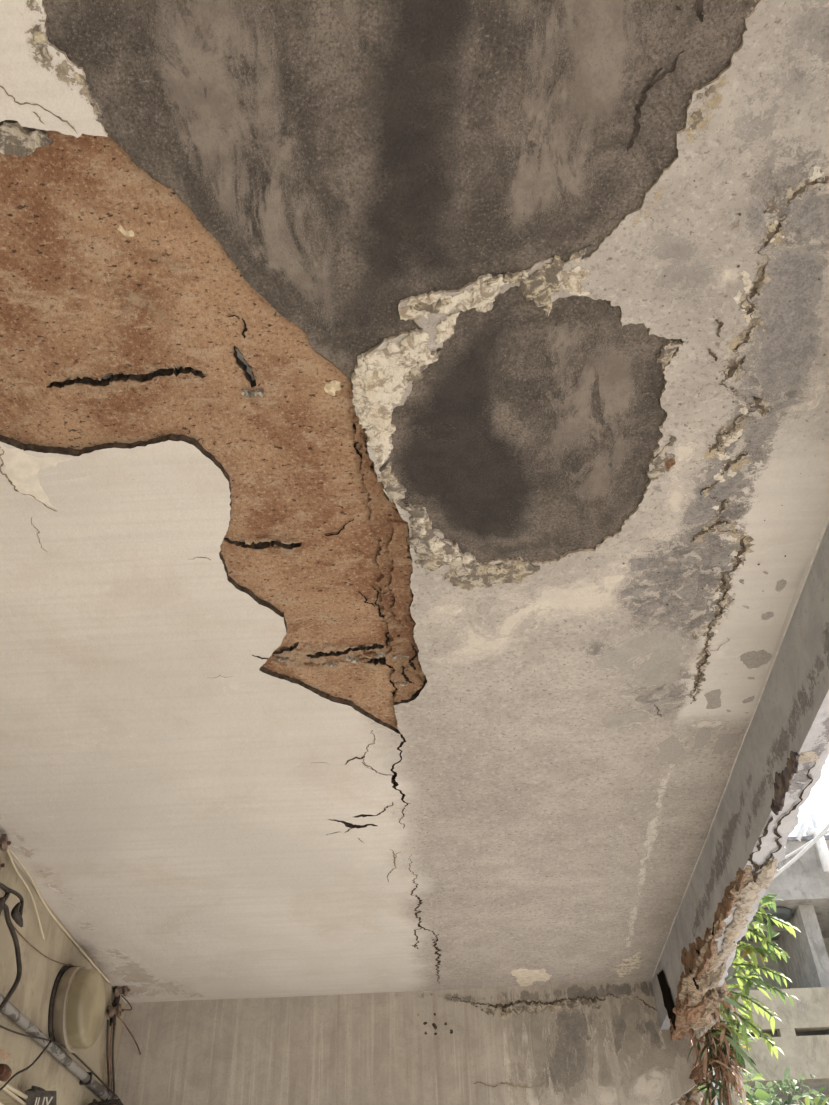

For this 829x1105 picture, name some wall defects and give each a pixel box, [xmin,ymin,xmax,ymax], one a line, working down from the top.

leakage [155,0,476,331]
crack [627,51,684,152]
spalling [0,0,760,734]
leakage [394,323,544,554]
leakage [432,0,829,731]
crack [670,166,829,704]
crack [311,730,735,1030]
spalling [669,865,757,1041]
leakage [691,623,829,937]
spalling [770,751,820,815]